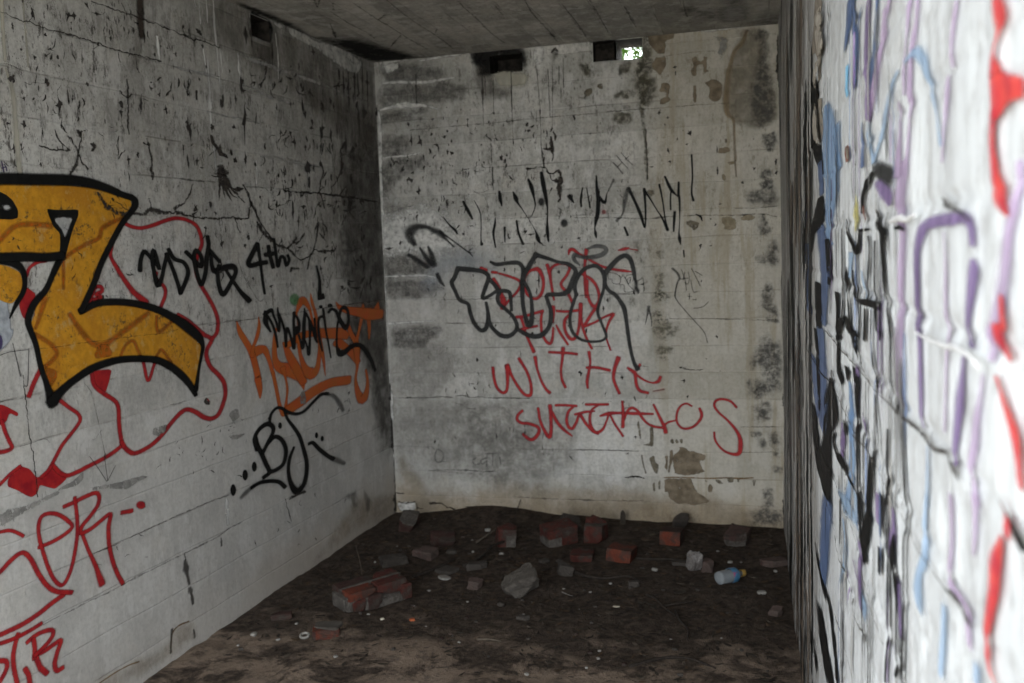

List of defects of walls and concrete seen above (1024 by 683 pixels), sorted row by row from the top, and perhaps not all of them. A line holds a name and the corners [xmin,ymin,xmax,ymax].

crack [1,12,376,325]
water stain [635,36,655,179]
water stain [724,18,776,173]
water stain [751,170,775,203]
water stain [748,342,781,419]
peeling [626,422,739,505]